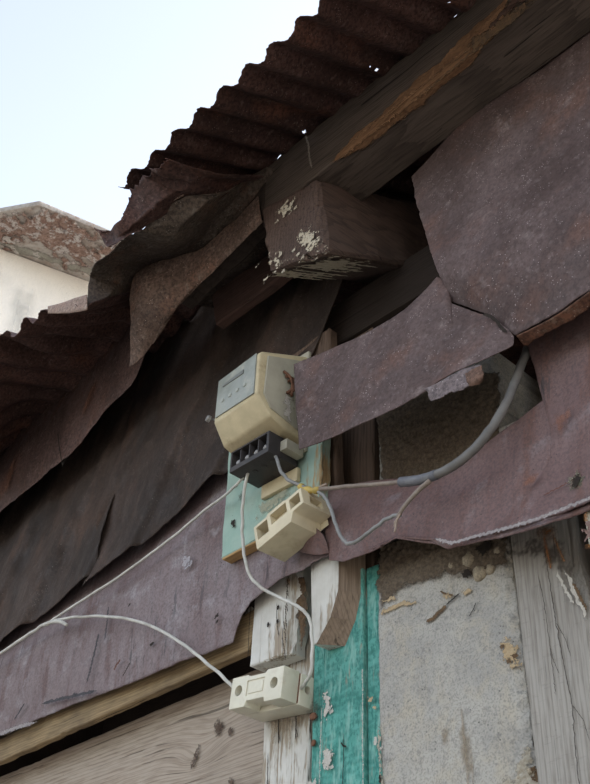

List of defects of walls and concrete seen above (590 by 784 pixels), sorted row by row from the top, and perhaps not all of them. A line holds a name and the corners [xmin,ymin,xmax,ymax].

peeling [275,197,297,223]
peeling [264,226,378,280]
spalling [375,496,590,615]
crack [538,550,589,784]
peeling [306,692,334,784]